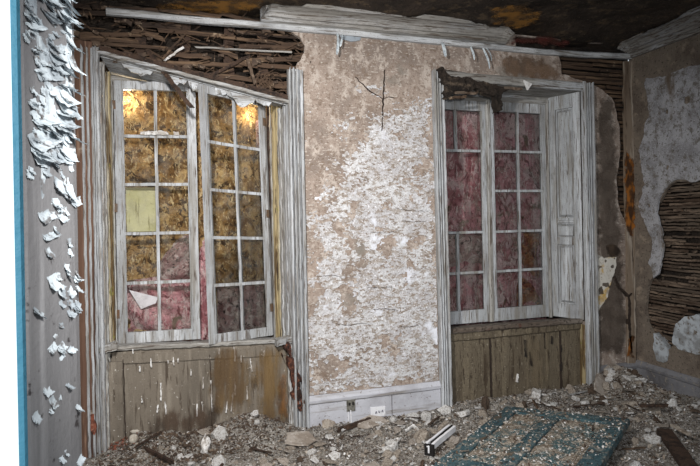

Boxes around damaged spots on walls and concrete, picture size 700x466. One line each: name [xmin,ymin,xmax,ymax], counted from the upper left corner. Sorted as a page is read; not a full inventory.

leakage [491,5,569,45]
crack [355,70,394,131]
flaking render [436,66,532,114]
peeling [23,0,304,318]
corrosion [624,152,635,238]
flaking render [638,65,700,363]
peeling [597,255,616,310]
peeling [47,322,78,361]
peeling [32,386,62,424]